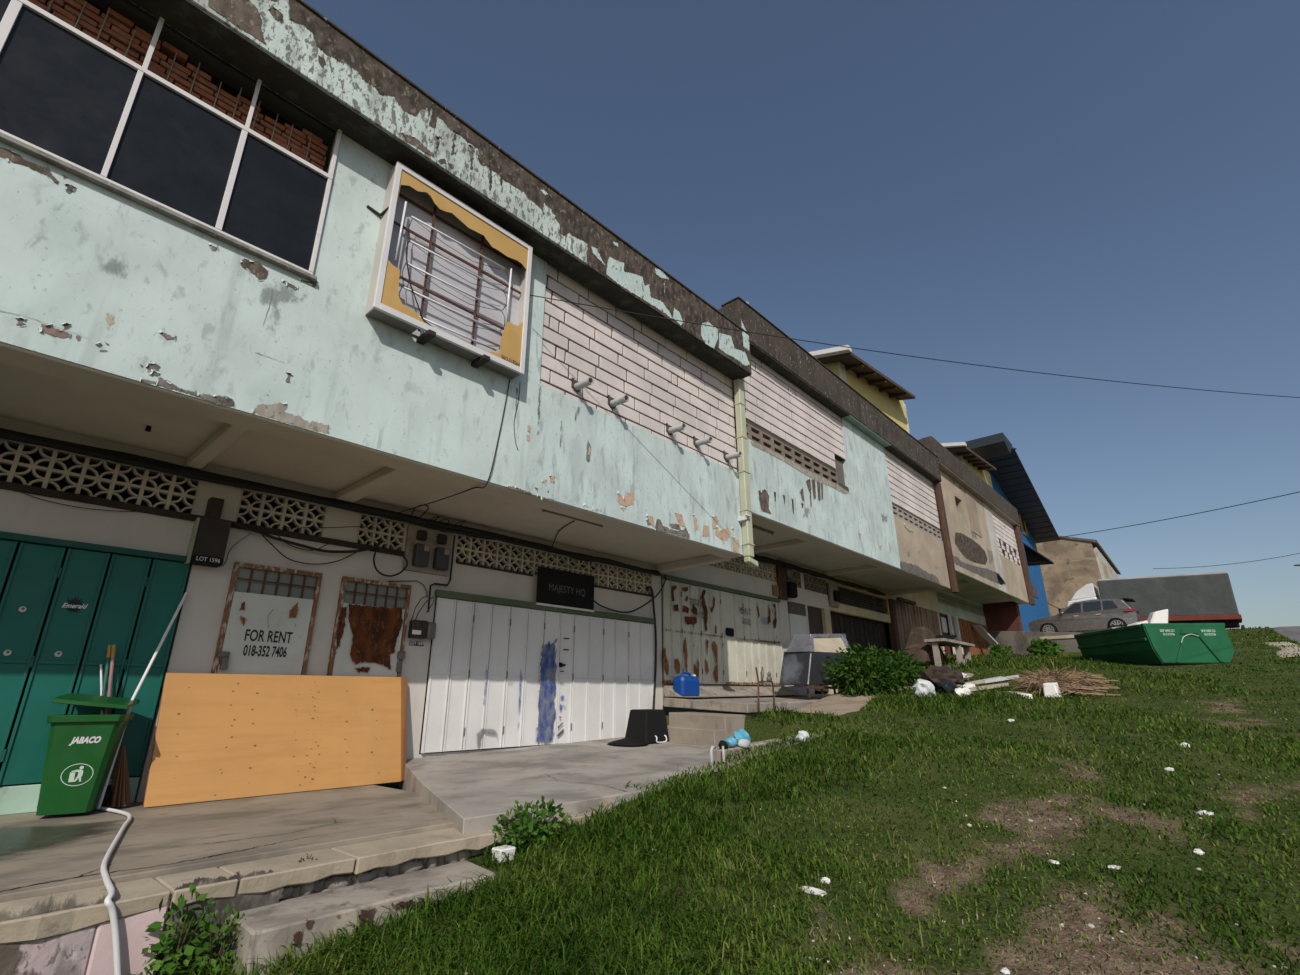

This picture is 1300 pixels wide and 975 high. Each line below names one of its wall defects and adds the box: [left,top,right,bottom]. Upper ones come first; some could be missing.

peeling [208,0,284,45]
peeling [0,147,76,194]
peeling [401,129,502,194]
peeling [240,258,318,291]
peeling [591,242,683,325]
peeling [701,321,750,366]
spalling [140,362,235,408]
spalling [251,393,330,434]
spalling [750,440,849,501]
peeling [758,489,771,514]
spalling [646,512,740,554]
corrosion [335,604,403,673]